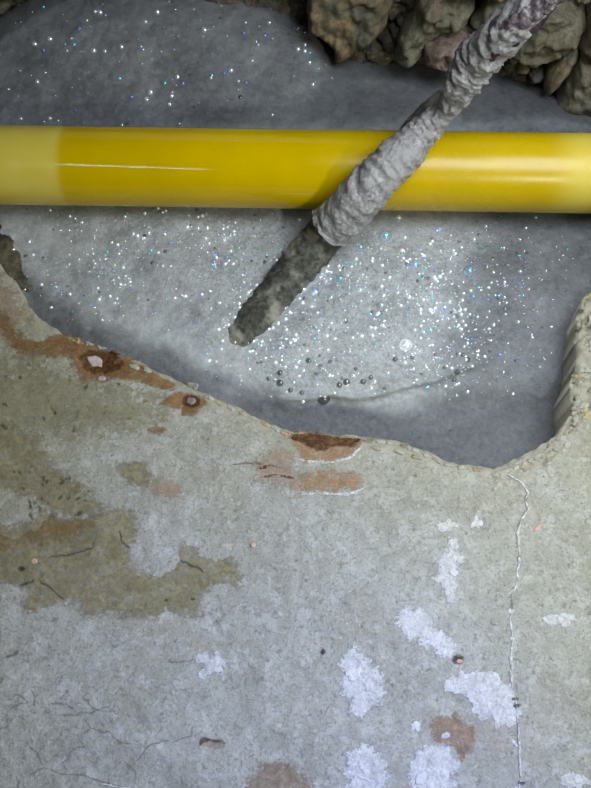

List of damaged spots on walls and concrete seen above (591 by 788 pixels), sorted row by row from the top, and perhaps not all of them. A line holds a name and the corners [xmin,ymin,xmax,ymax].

corrosion [0,311,84,373]
spalling [70,337,152,381]
corrosion [119,358,206,416]
spalling [204,394,483,499]
spalling [492,366,591,491]
leakage [0,356,244,618]
leakage [393,600,457,661]
crack [499,471,530,788]
leakage [337,643,387,721]
leakage [342,740,392,788]
leakage [406,742,460,788]
corrosion [430,711,475,761]